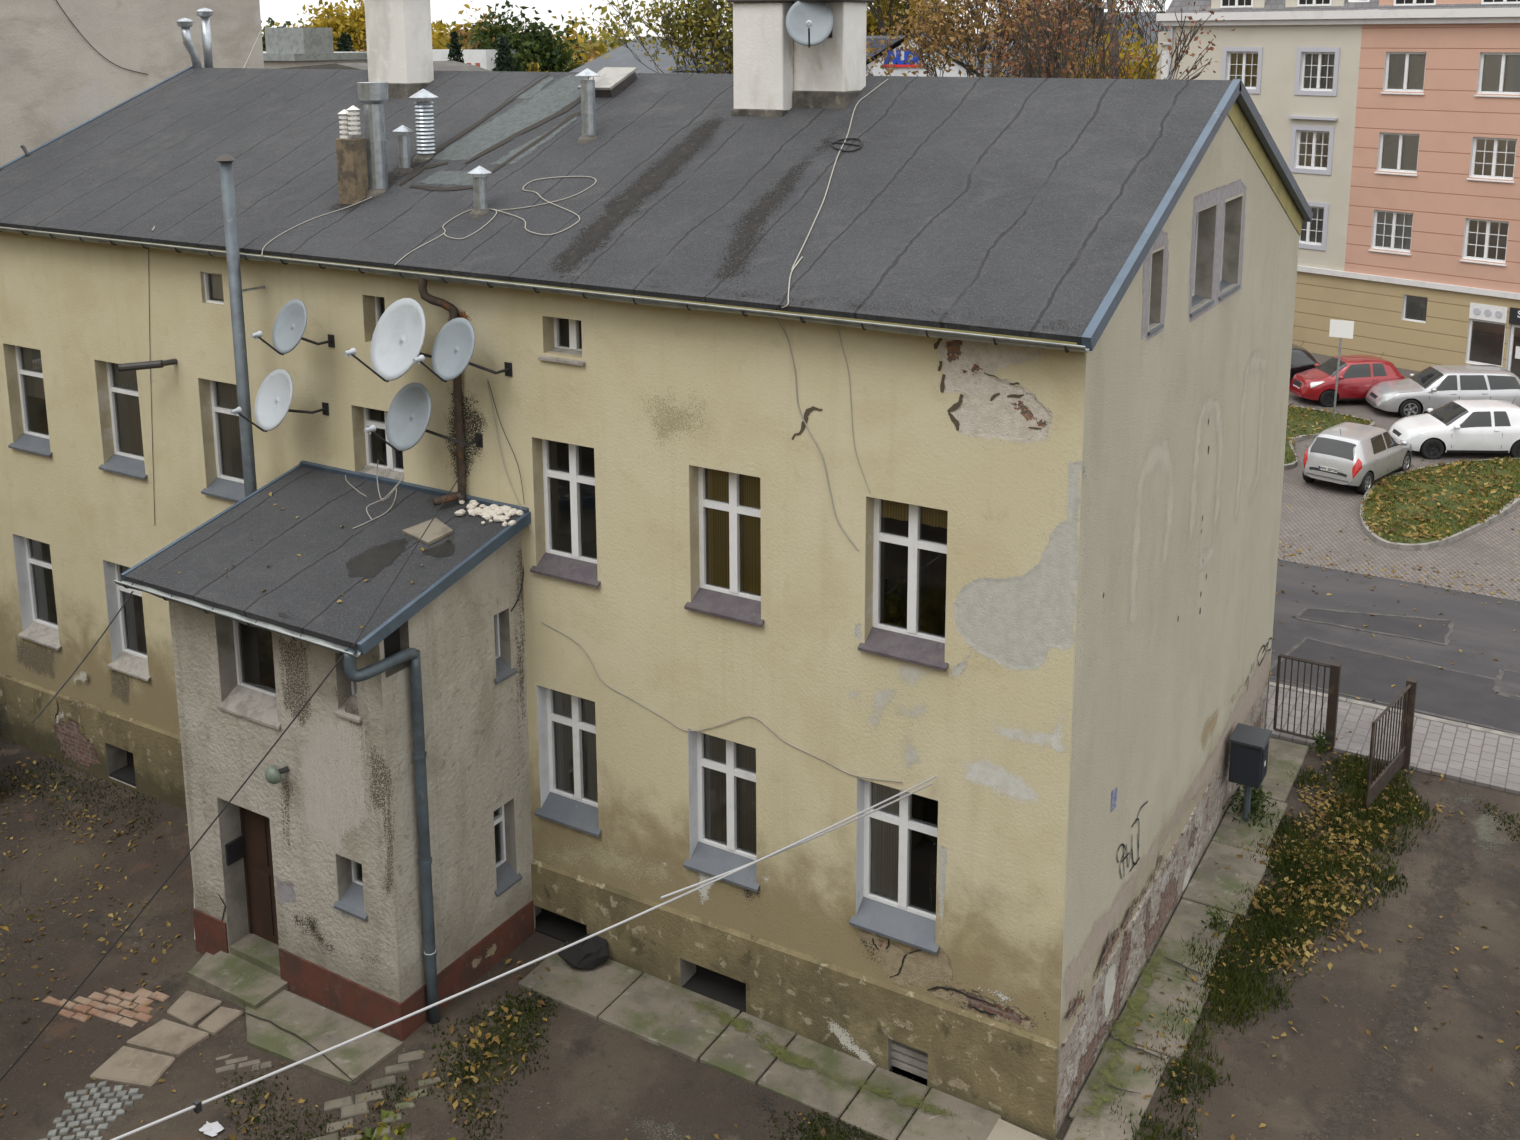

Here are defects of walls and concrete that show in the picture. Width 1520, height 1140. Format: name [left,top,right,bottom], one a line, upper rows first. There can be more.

water stain [323,154,439,213]
water stain [416,109,1081,333]
crack [791,406,823,440]
flaking render [934,338,1054,444]
flaking render [854,927,1037,1033]
flaking render [1064,856,1179,1116]
peeling [931,1055,976,1090]